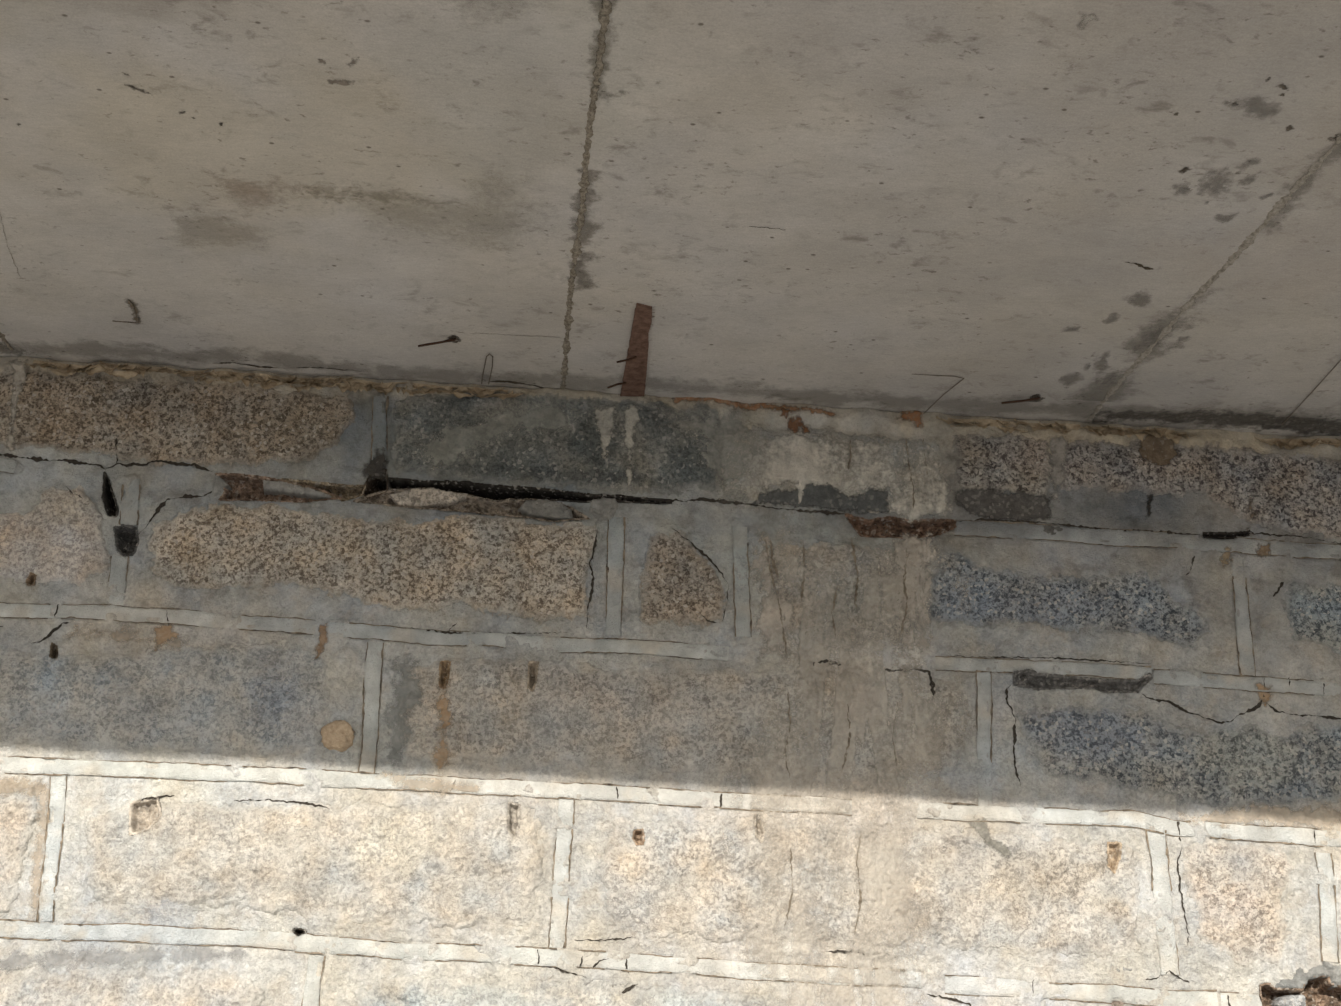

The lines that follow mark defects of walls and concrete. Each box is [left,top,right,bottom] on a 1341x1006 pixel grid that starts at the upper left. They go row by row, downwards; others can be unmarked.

crack [0,438,216,534]
crack [799,658,841,666]
crack [885,655,1341,787]
spalling [1270,994,1306,1006]